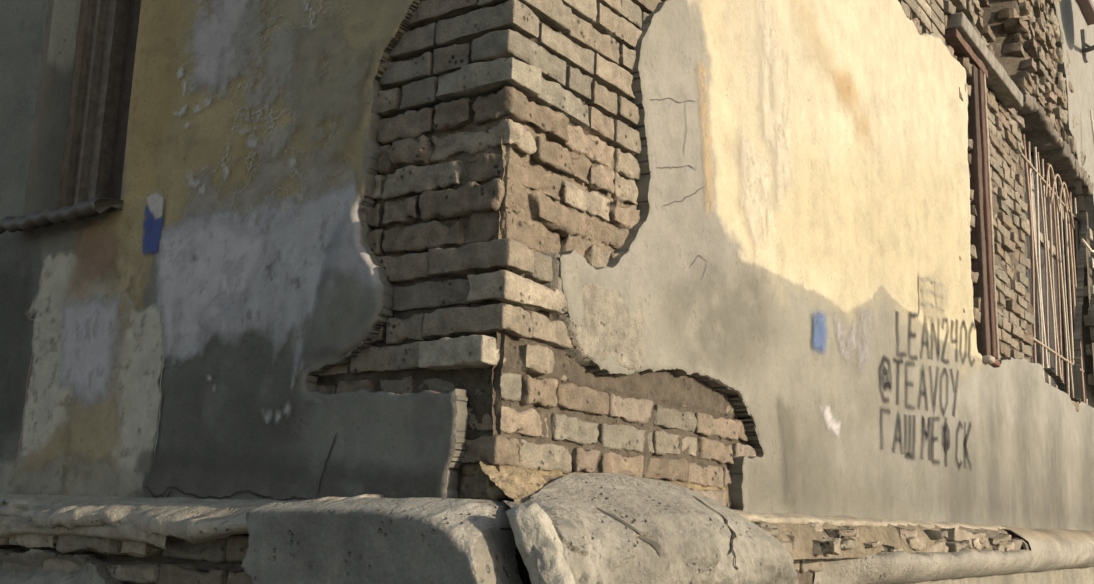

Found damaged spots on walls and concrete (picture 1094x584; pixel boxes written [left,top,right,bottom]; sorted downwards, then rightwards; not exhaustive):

peeling [176,0,367,235]
peeling [1,193,166,497]
spalling [317,0,756,509]
crack [597,507,662,557]
crack [694,496,738,569]
spalling [754,521,1024,561]